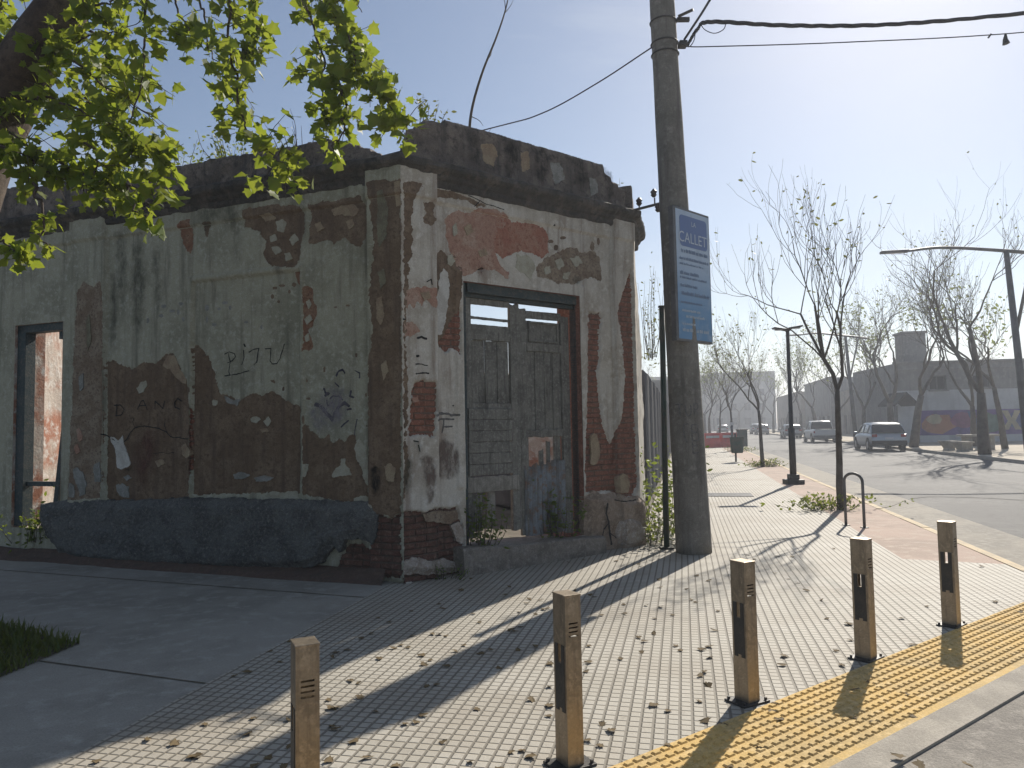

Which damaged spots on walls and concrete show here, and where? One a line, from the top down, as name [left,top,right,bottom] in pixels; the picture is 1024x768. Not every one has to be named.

flaking render [68,177,602,583]
spalling [583,274,637,497]